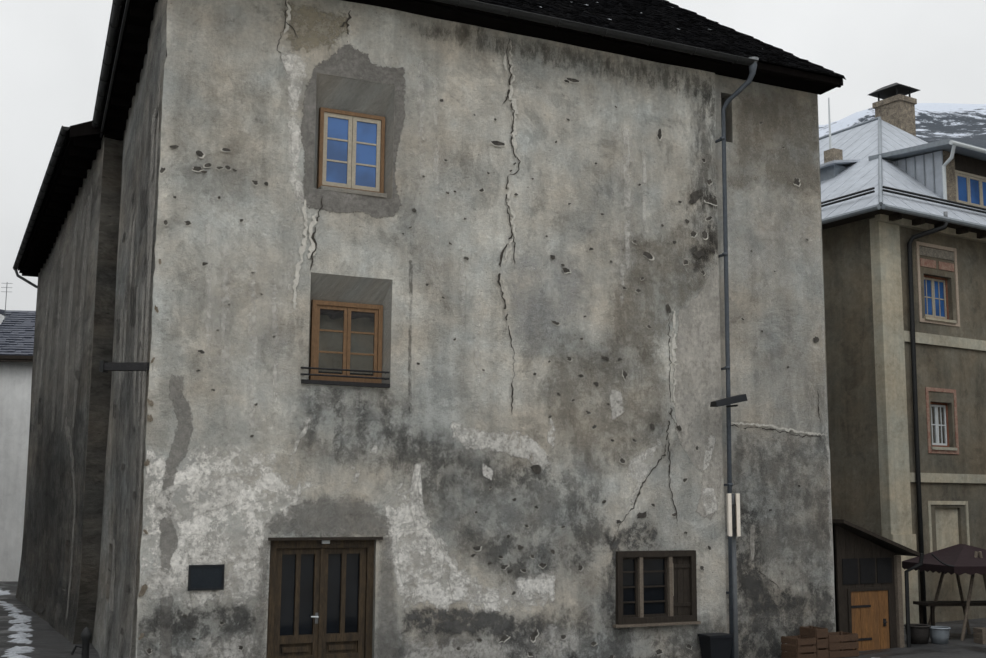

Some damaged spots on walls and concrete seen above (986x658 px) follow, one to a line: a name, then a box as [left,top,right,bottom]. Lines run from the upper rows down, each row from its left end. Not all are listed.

crack [277,0,298,61]
peeling [281,47,306,204]
crack [290,197,323,315]
crack [497,38,521,412]
peeling [120,148,312,658]
peeling [450,416,555,474]
crack [612,308,679,543]
crack [725,391,825,439]
peeling [384,473,555,613]
water stain [404,608,542,650]
water stain [603,523,657,625]
water stain [736,507,835,658]